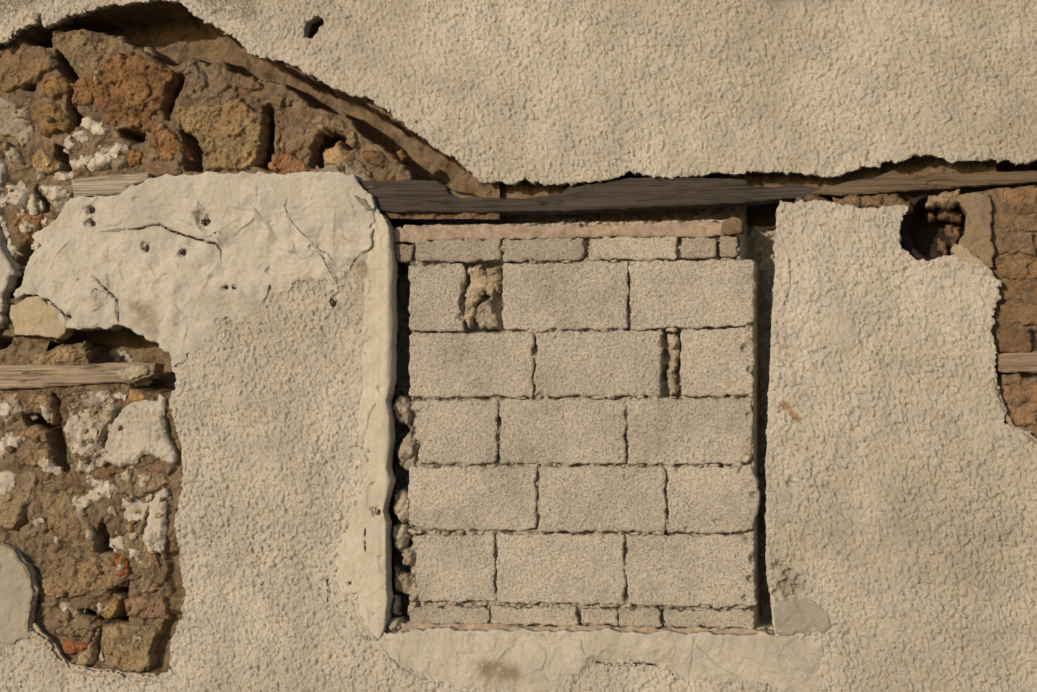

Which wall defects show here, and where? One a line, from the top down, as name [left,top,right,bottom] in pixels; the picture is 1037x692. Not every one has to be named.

crack [104,217,222,257]
crack [284,196,337,287]
crack [93,278,119,323]
spalling [0,1,650,682]
spalling [665,155,1037,444]